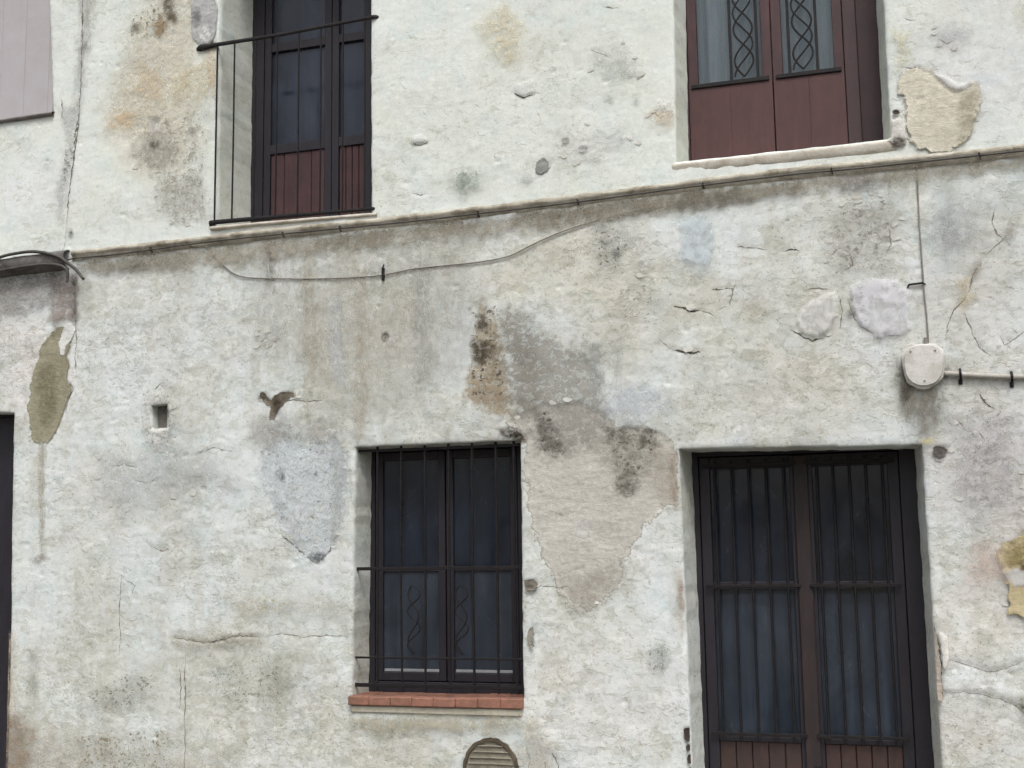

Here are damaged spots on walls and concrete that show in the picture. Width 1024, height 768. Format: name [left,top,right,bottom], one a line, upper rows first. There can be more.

crack [58,0,90,245]
peeling [888,67,982,153]
crack [946,235,1024,354]
flaking render [27,323,76,528]
water stain [534,408,561,453]
peeling [500,307,680,612]
water stain [608,429,656,494]
flaking render [979,529,1024,617]
crack [177,630,346,768]